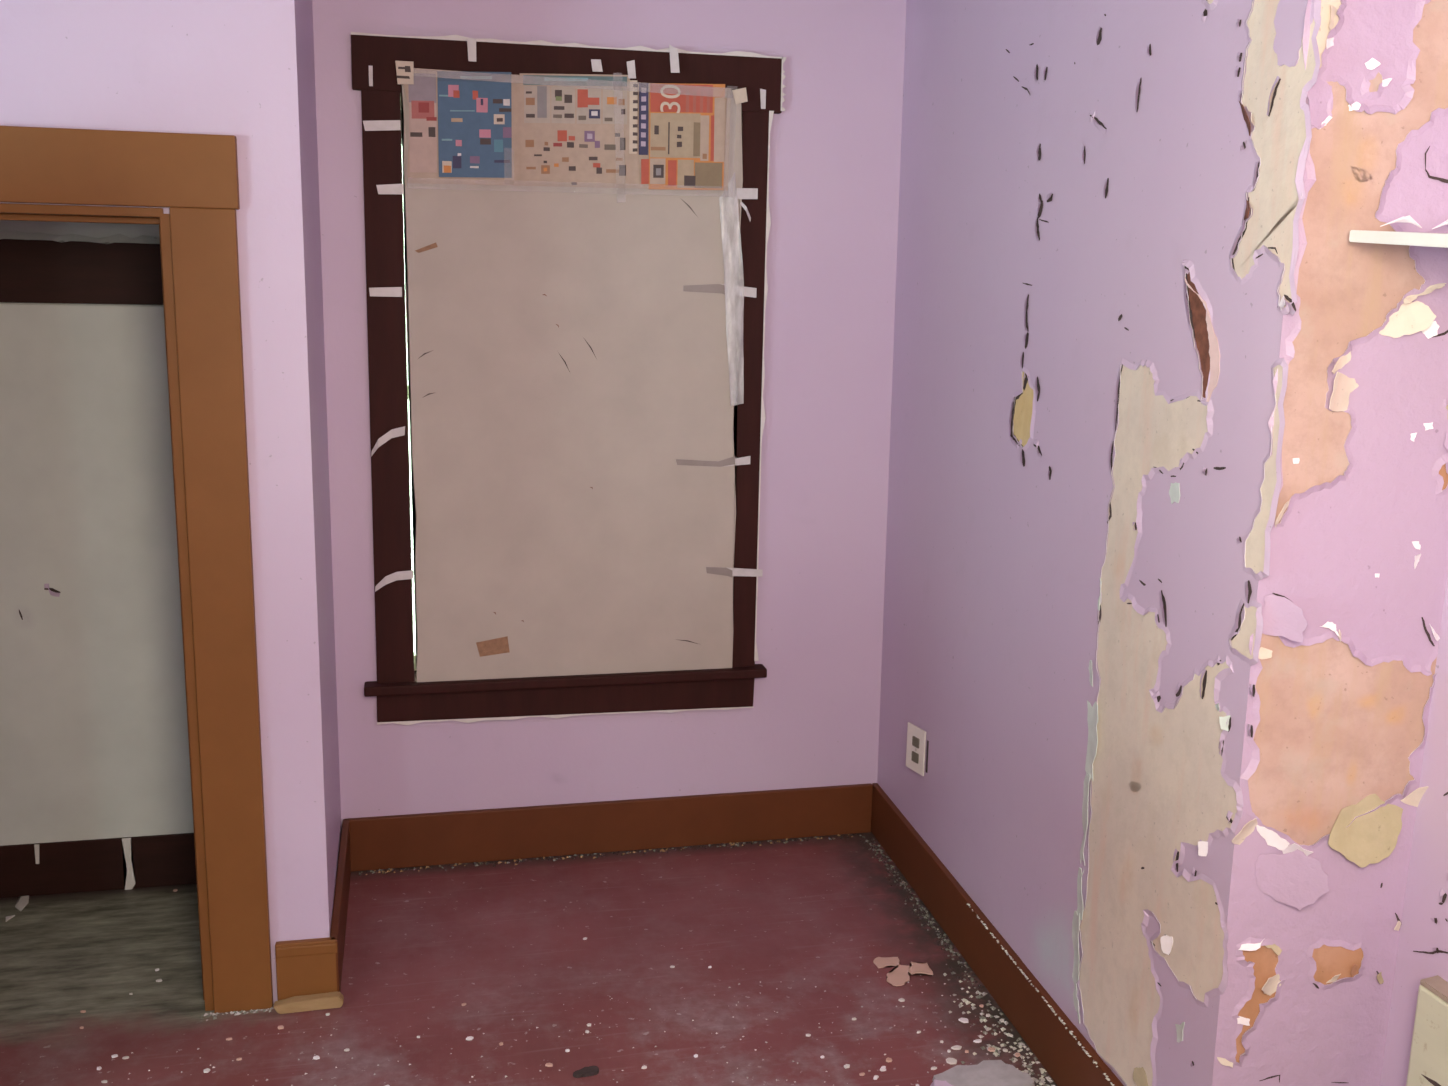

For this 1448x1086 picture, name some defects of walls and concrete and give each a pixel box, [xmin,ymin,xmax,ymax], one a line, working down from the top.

peeling [1013,367,1036,452]
peeling [1229,0,1448,580]
peeling [1072,358,1440,1086]